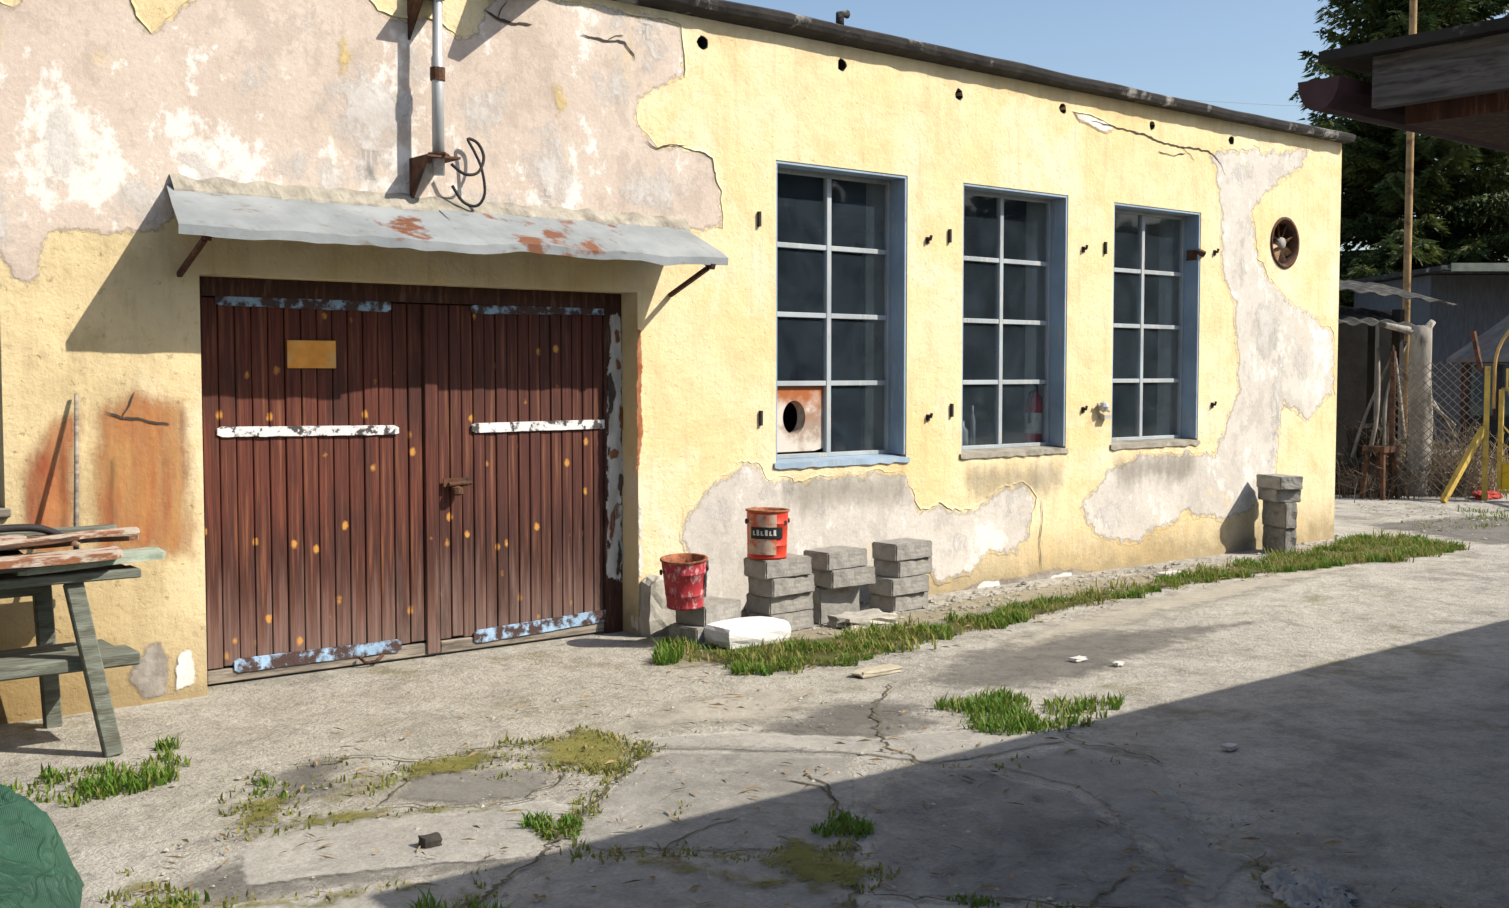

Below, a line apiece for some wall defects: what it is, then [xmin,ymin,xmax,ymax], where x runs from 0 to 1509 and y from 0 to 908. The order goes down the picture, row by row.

peeling [0,0,725,282]
crack [1092,121,1225,174]
corrosion [27,416,74,552]
crack [106,392,170,425]
corrosion [97,394,186,553]
peeling [679,459,1090,617]
peeling [1079,143,1335,547]
crack [290,733,658,908]
crack [607,764,1127,908]
crack [869,681,935,765]
crack [1062,732,1167,766]